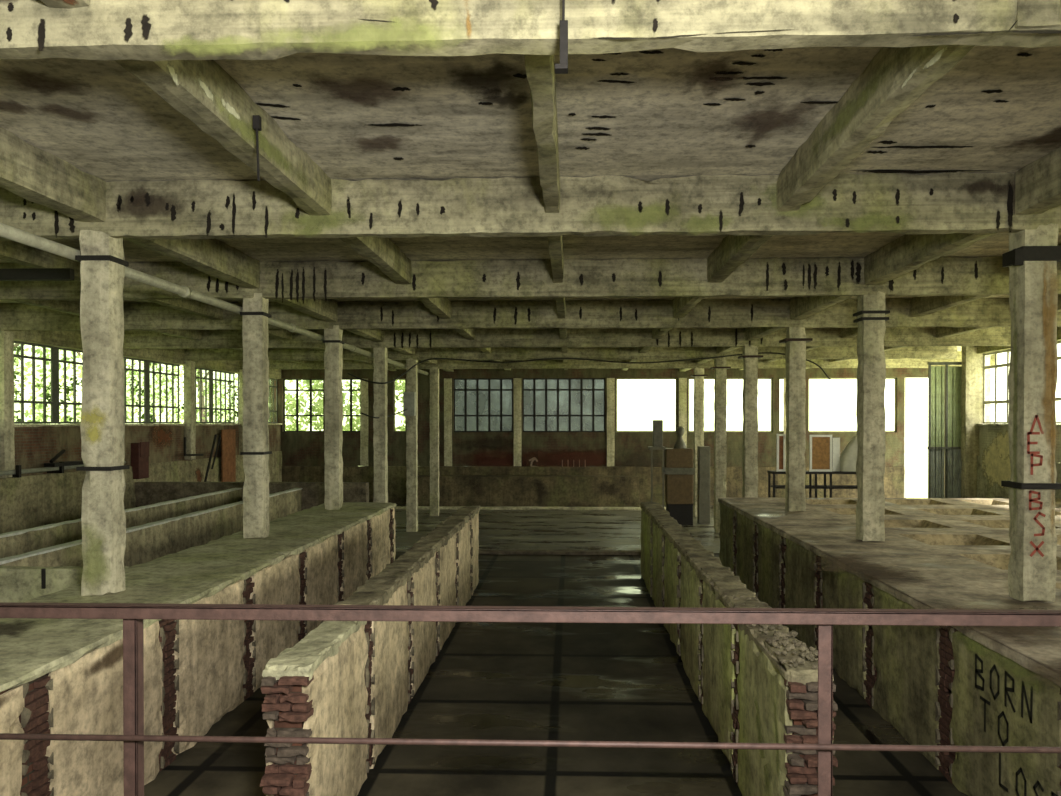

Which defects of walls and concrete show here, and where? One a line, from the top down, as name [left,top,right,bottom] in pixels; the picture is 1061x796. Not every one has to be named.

leakage [316,79,400,105]
leakage [459,63,526,106]
leakage [692,63,737,89]
leakage [744,110,802,140]
leakage [358,138,399,149]
spalling [19,676,54,796]